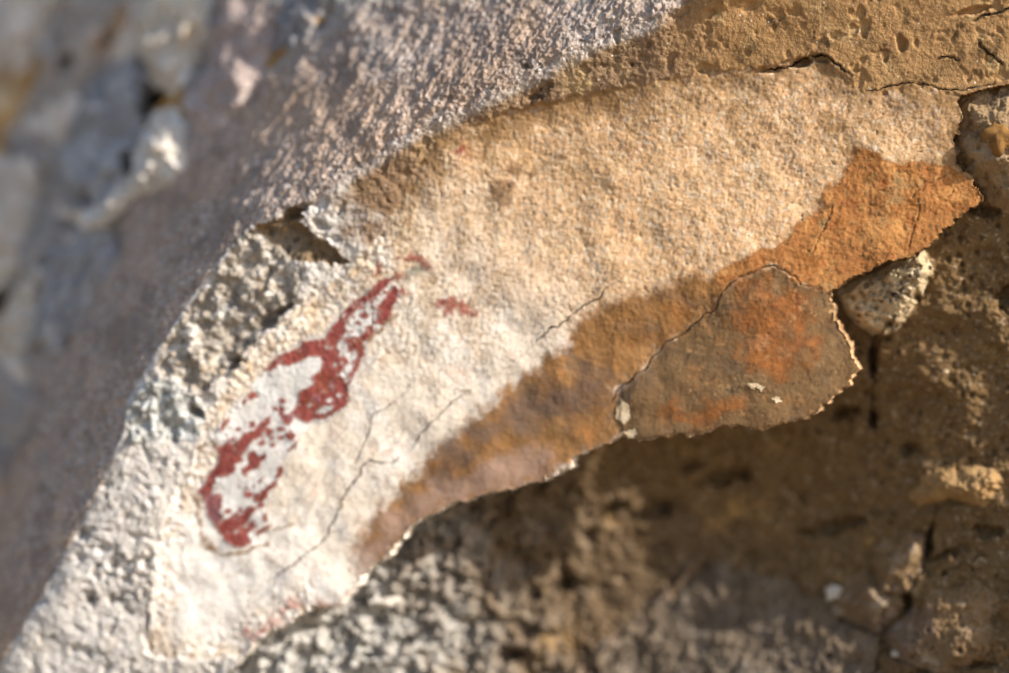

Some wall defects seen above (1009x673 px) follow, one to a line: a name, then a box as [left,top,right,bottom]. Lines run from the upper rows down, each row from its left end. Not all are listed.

crack [767,7,1009,91]
peeling [125,205,400,556]
crack [222,281,619,623]
peeling [615,398,637,438]
crack [612,265,819,400]